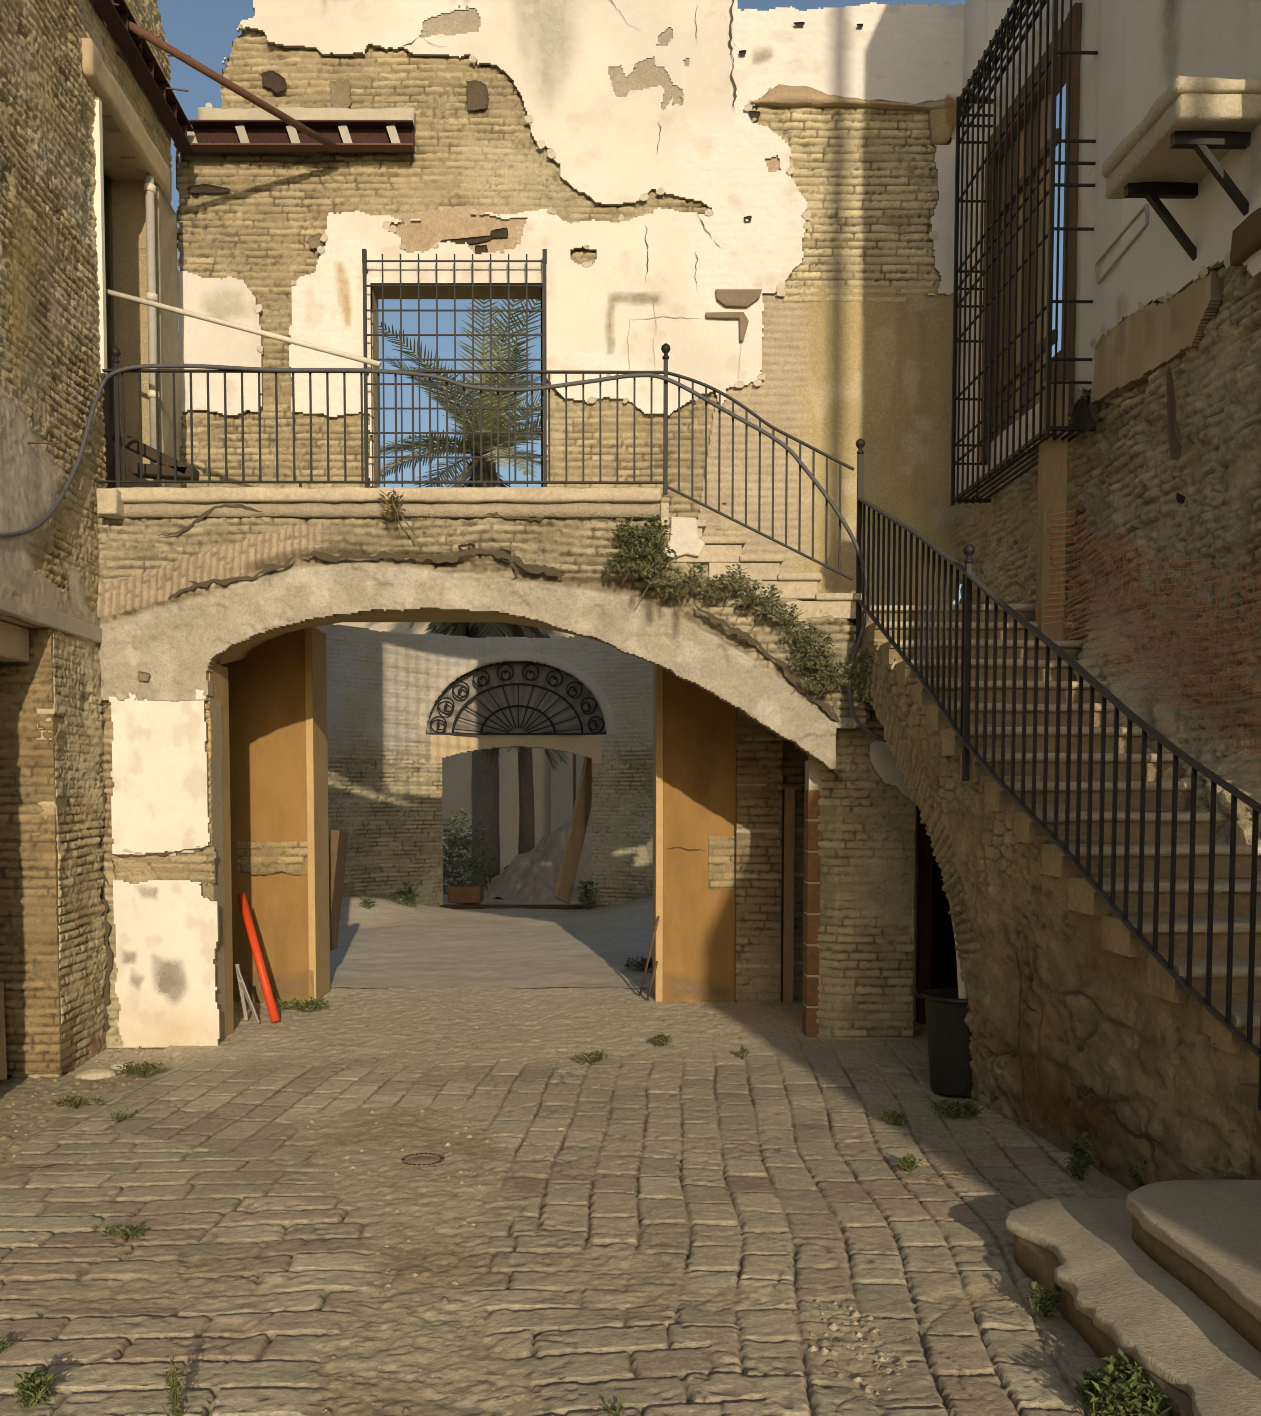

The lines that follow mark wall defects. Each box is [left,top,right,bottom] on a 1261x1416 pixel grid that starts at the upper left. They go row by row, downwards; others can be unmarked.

peeling [419,5,481,38]
peeling [176,24,714,489]
peeling [542,87,1039,605]
peeling [1064,251,1261,879]
spalling [112,846,217,884]
peeling [237,841,308,873]
leakage [157,963,184,999]
crack [1000,945,1039,1109]
crack [1070,1079,1165,1148]